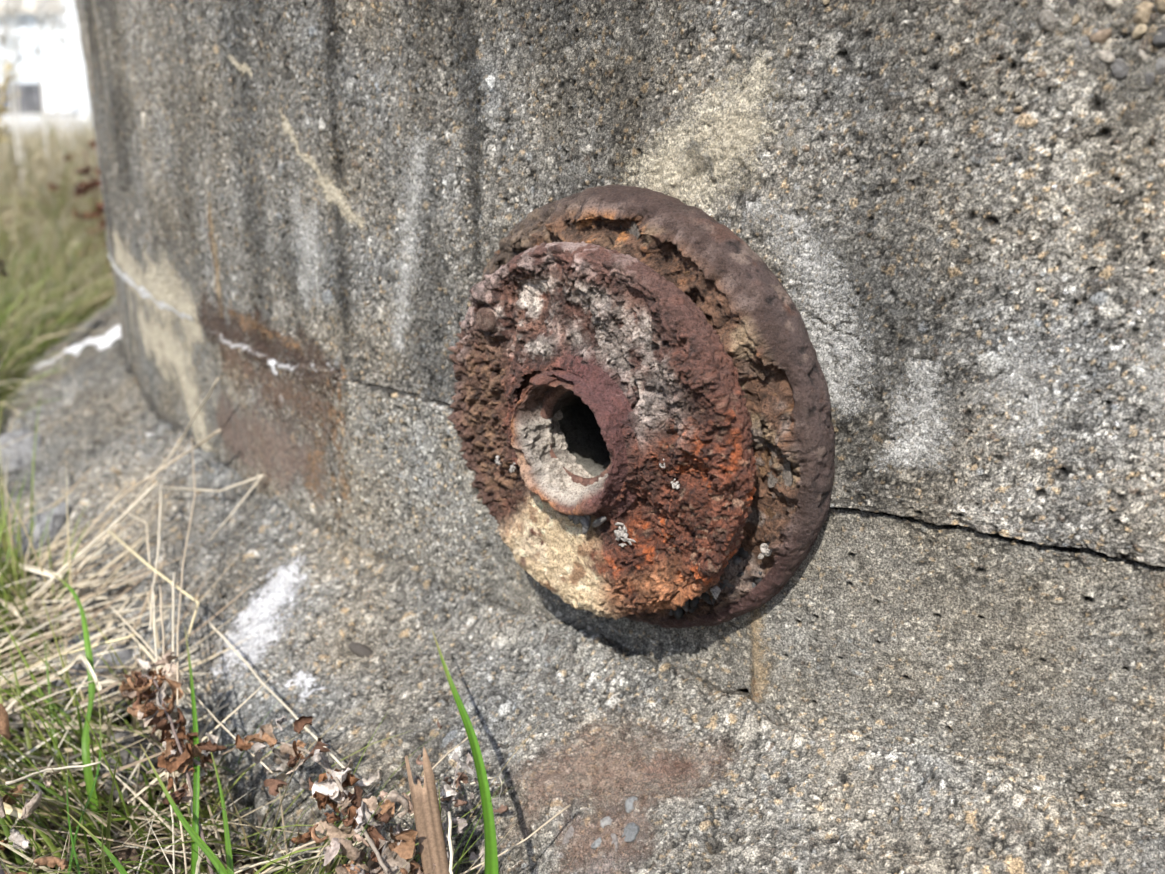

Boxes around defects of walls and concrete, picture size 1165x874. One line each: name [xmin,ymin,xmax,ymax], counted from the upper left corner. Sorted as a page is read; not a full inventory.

rust [197,193,353,520]
crack [829,507,1163,567]